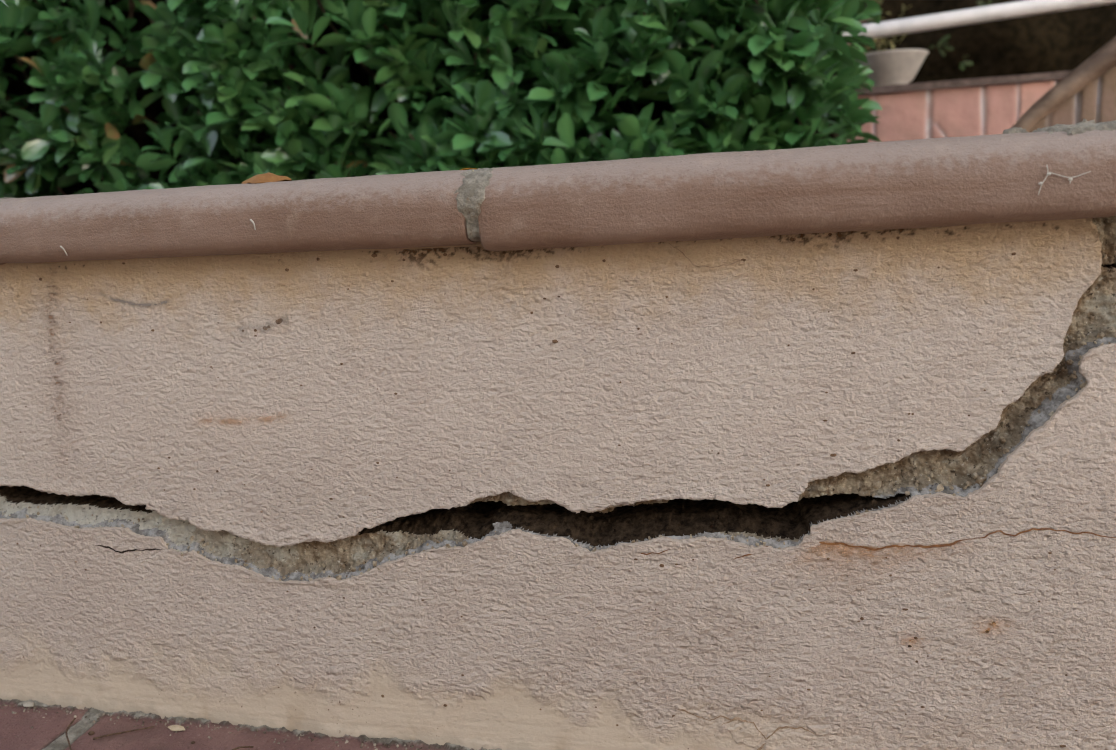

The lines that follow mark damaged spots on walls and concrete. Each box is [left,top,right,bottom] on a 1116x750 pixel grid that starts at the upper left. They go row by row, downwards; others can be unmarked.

spalling [798,215,1116,501]
crack [0,485,163,553]
crack [359,493,1116,571]